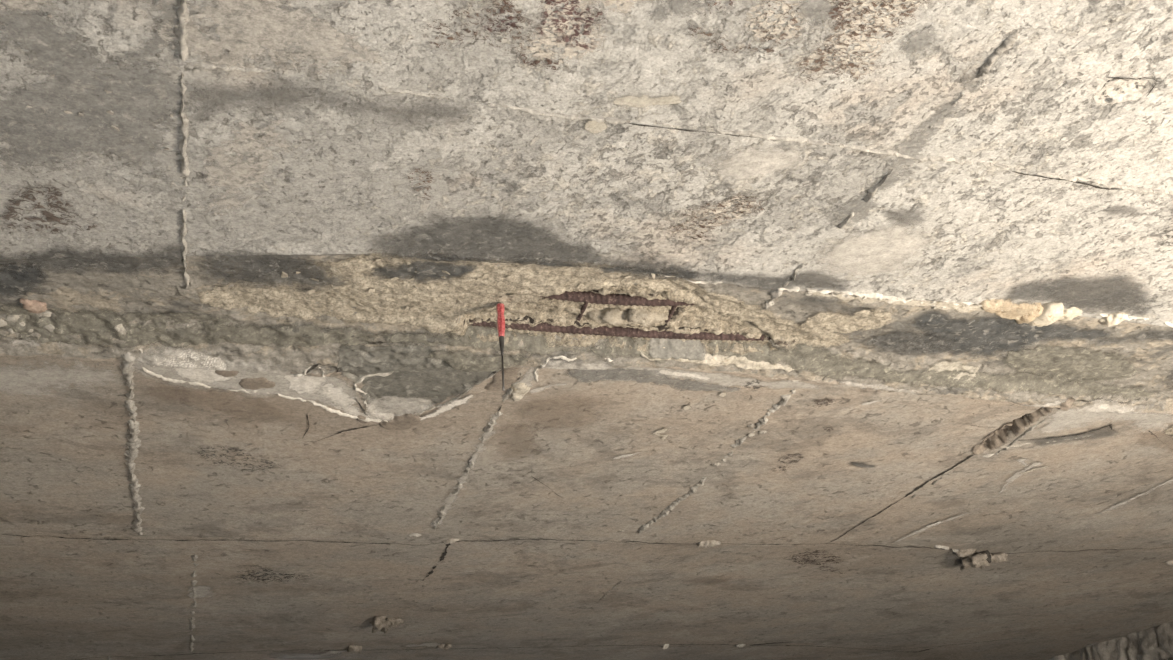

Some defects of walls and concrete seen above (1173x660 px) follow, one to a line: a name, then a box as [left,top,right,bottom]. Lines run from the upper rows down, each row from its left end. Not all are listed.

crack [628,123,757,138]
crack [1012,171,1119,190]
spalling [198,250,892,441]
damp [375,217,1173,356]
peeling [831,398,1173,542]
crack [422,543,451,581]